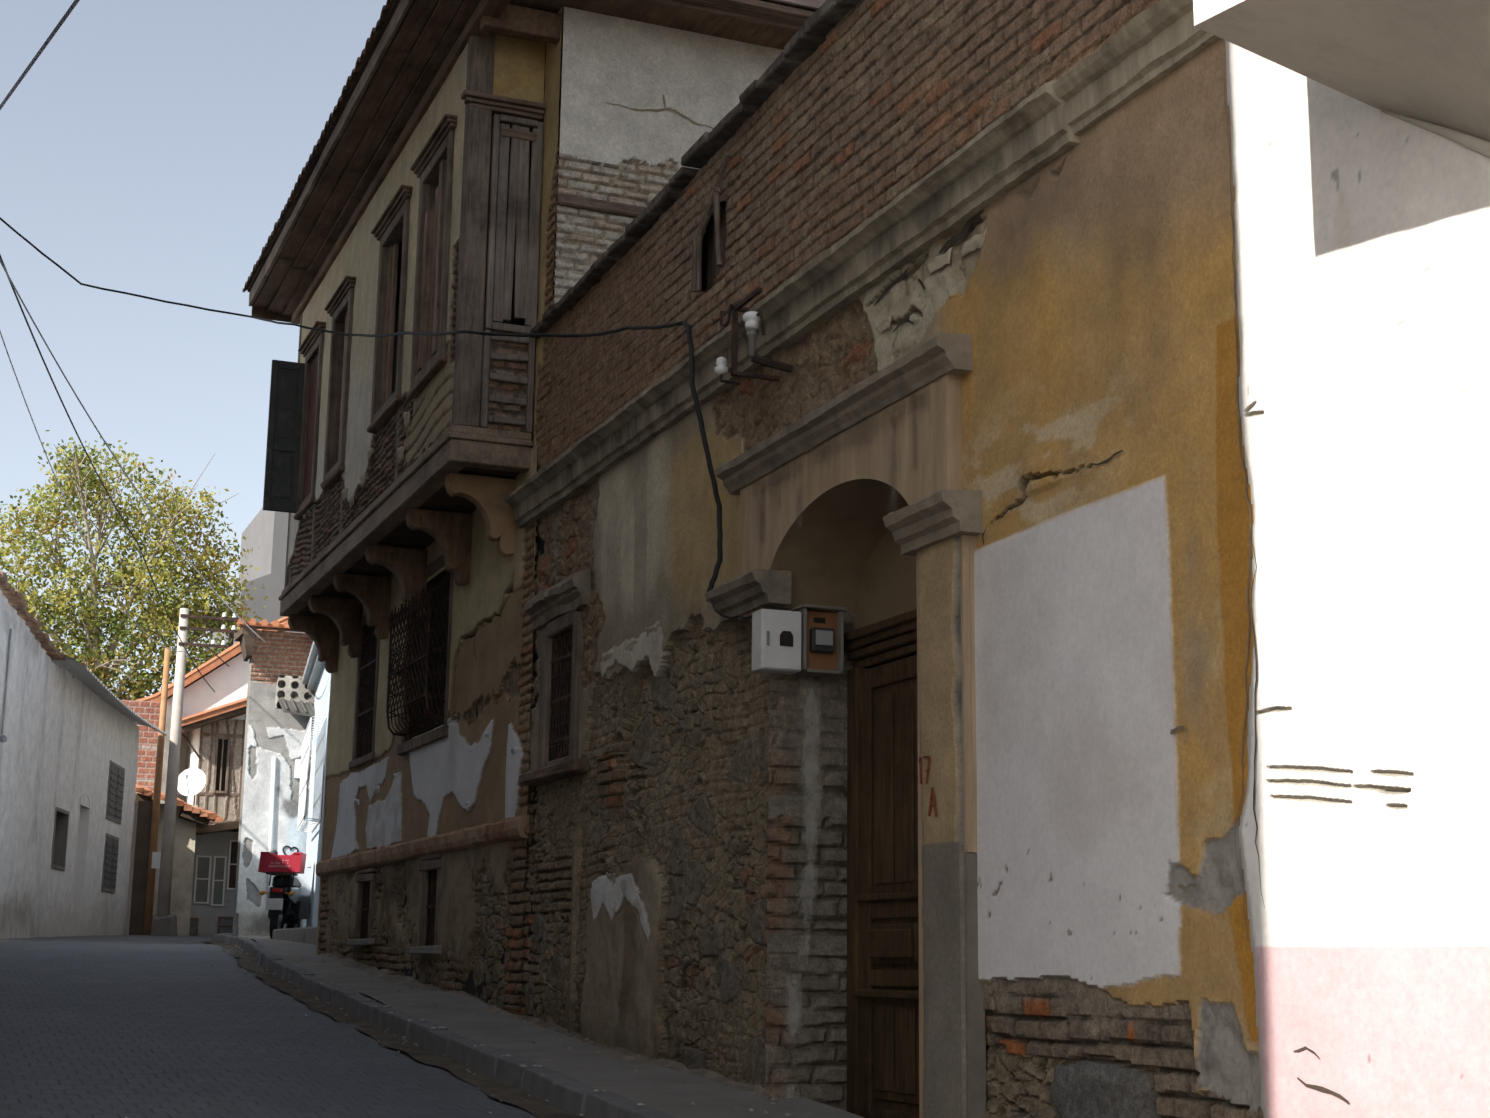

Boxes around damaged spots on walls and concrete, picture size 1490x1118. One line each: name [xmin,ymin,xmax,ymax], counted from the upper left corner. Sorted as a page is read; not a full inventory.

crack [604,95,713,129]
spalling [712,209,987,453]
crack [982,449,1123,545]
peeling [249,719,311,804]
spalling [317,480,769,1088]
peeling [242,837,262,907]
spalling [1163,814,1246,915]
spalling [979,975,1264,1118]